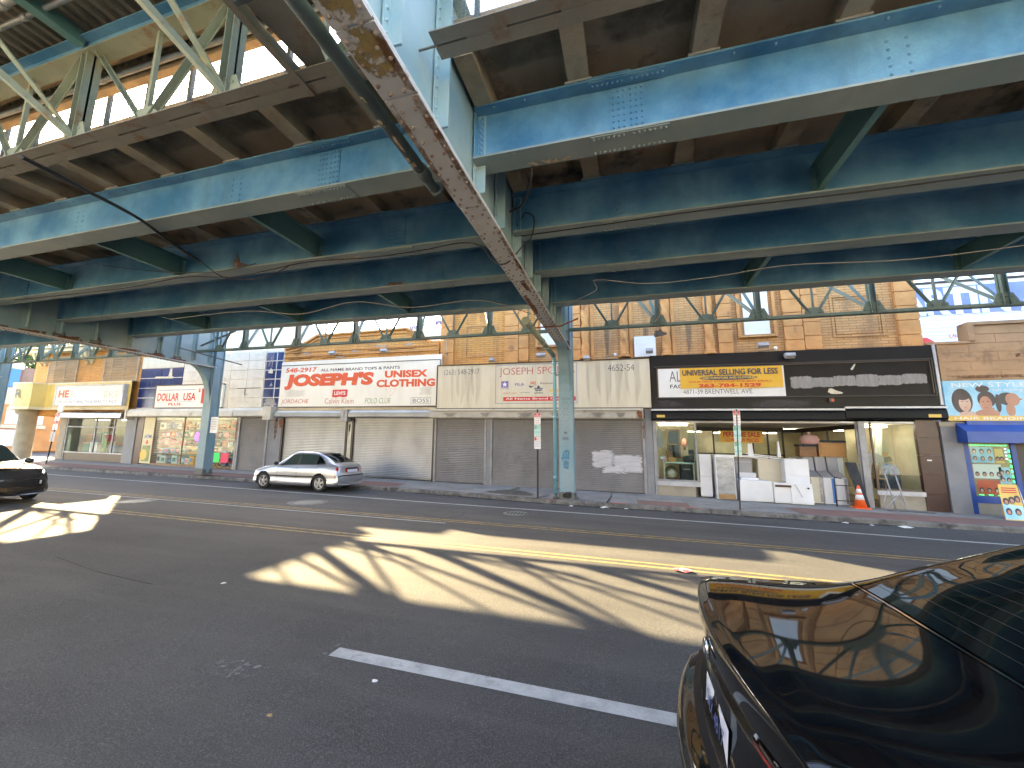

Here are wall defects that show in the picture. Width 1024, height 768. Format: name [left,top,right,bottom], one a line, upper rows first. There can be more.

rust [318,0,415,91]
rust [417,107,481,203]
rust [500,238,538,314]